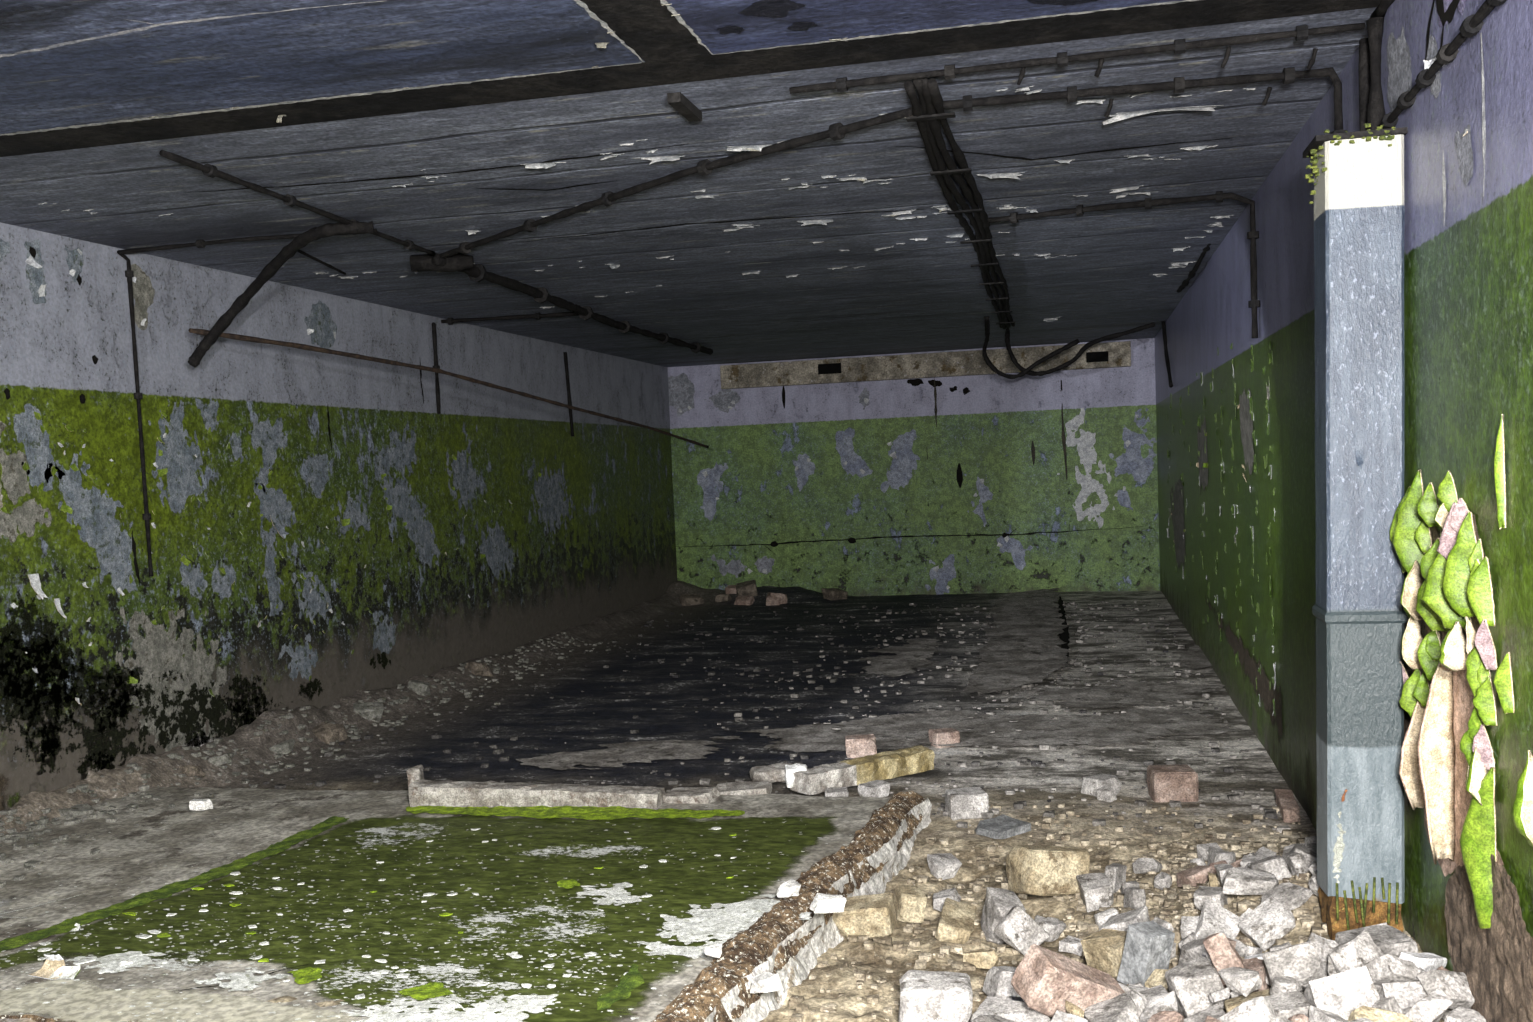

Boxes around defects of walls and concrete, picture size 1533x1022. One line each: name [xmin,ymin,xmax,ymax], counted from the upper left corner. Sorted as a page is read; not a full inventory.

water stain [715,0,818,34]
spalling [660,0,1197,55]
peeling [726,140,786,151]
peeling [0,388,236,752]
peeling [148,396,576,681]
peeling [1057,341,1276,717]
water stain [0,586,323,811]
water stain [367,651,391,670]
water stain [516,680,1253,770]
peeling [960,588,1071,693]
peeling [1404,617,1480,643]
spalling [1438,670,1533,1022]